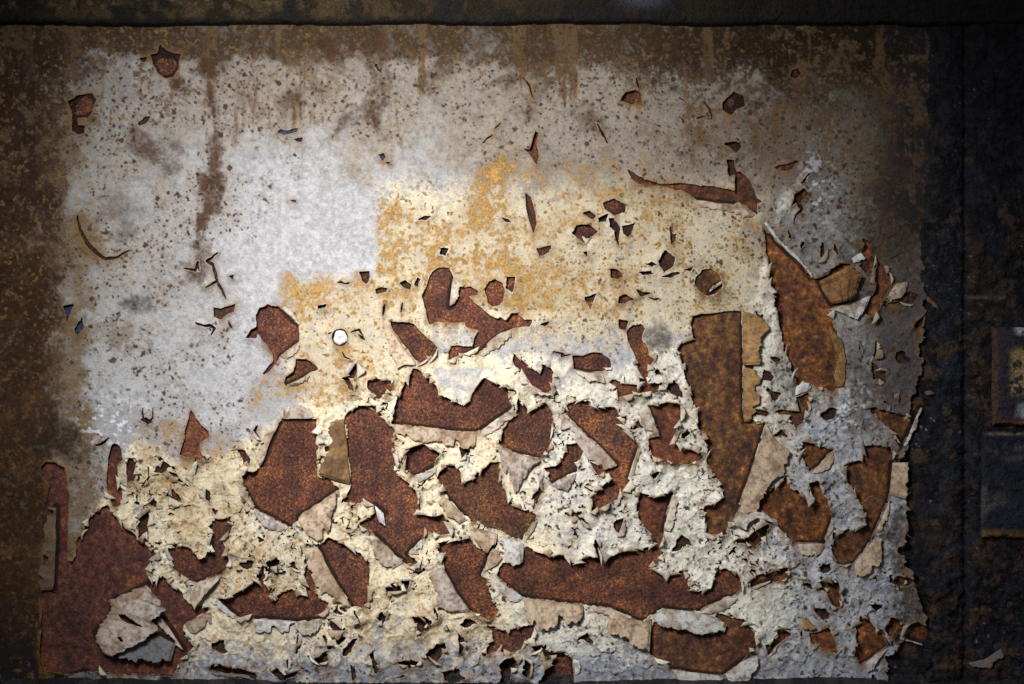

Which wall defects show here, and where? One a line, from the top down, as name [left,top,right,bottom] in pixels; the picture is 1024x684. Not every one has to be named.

corrosion [196,55,226,78]
crack [77,216,130,260]
corrosion [281,156,637,329]
crack [184,252,232,335]
peeling [38,142,939,681]